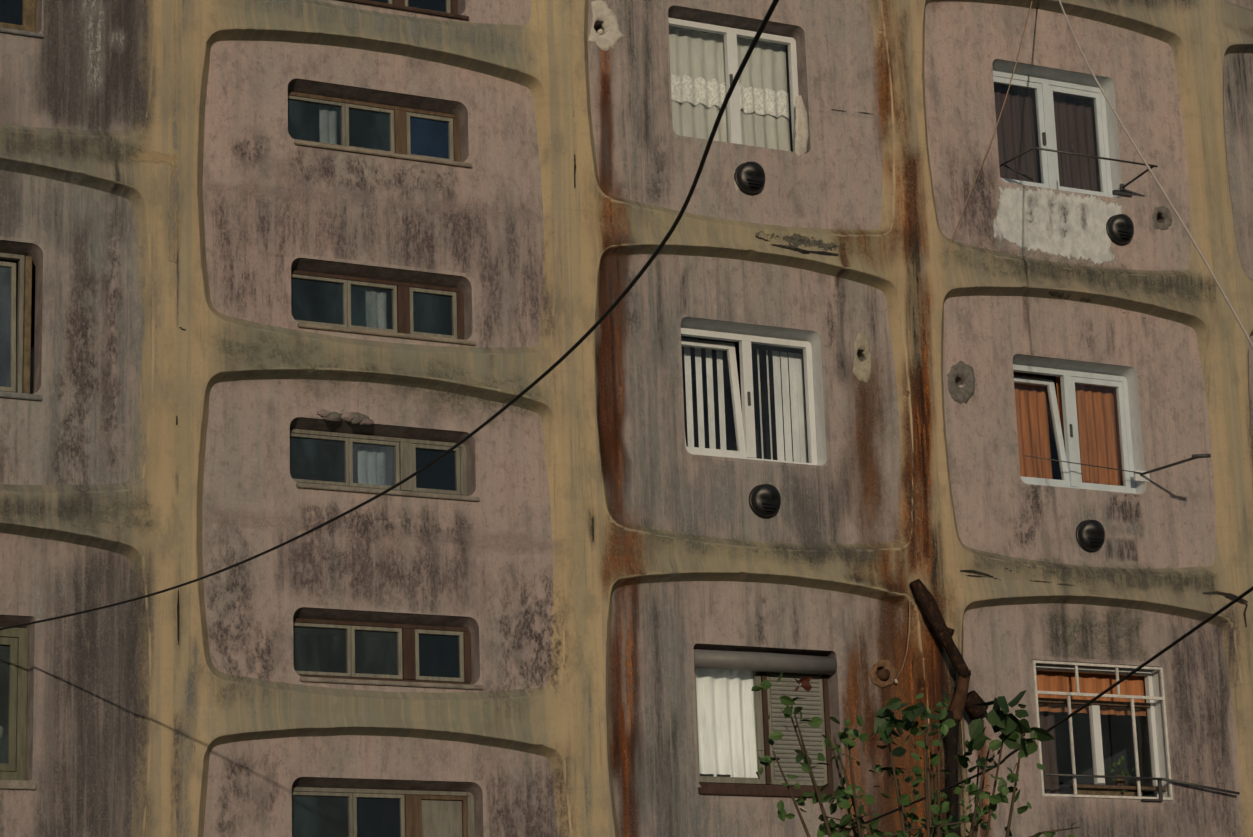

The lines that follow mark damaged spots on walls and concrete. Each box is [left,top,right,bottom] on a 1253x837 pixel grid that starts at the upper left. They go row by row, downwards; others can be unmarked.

water stain [6,0,148,159]
spalling [755,231,843,251]
peeling [993,184,1123,264]
rust [596,51,643,837]
rust [836,5,963,837]
water stain [35,559,151,837]